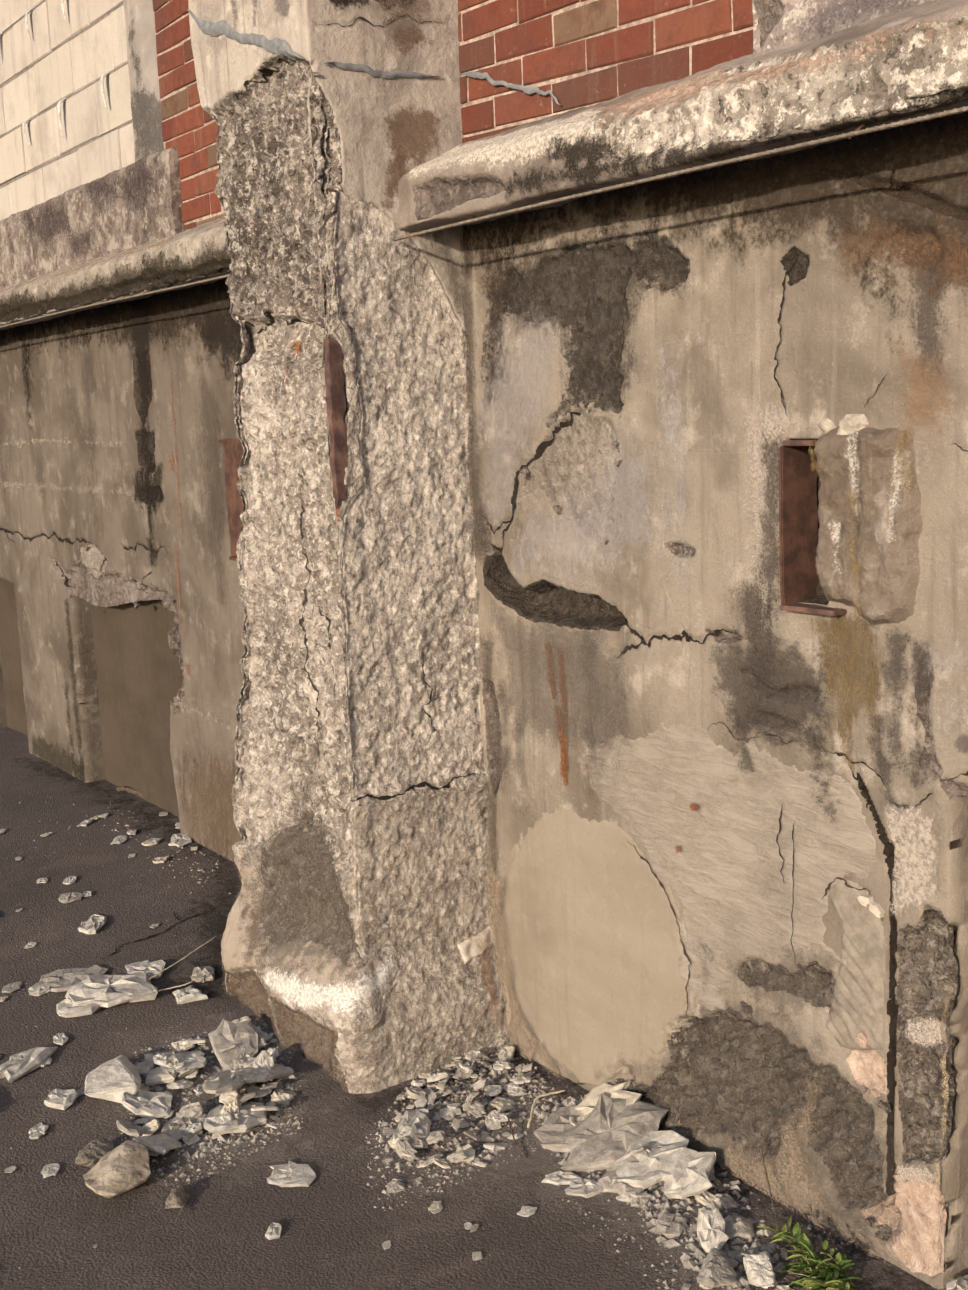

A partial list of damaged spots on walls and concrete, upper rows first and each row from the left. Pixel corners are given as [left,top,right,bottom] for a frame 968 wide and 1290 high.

leakage [275,0,289,16]
crack [312,100,340,234]
crack [187,9,561,105]
crack [0,528,168,591]
leakage [0,251,241,565]
peeling [0,54,628,1094]
corrosion [545,644,568,786]
spalling [501,232,691,545]
leakage [410,109,968,613]
crack [774,261,796,417]
spalling [615,905,958,1276]
crack [708,722,968,1196]